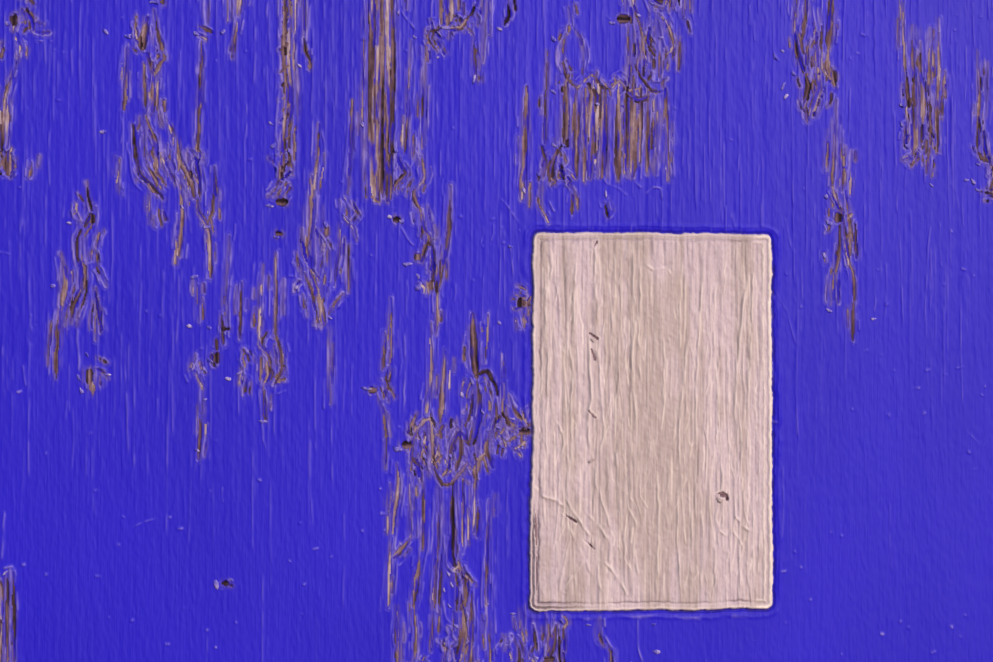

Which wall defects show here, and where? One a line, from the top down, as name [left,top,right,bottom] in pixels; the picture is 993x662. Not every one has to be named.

peeling [0,78,16,178]
peeling [5,0,49,64]
peeling [297,0,312,69]
peeling [519,0,690,223]
peeling [773,0,838,122]
peeling [897,0,946,187]
peeling [963,68,993,203]
peeling [120,0,286,423]
peeling [295,133,359,327]
peeling [348,0,568,662]
peeling [0,570,16,662]